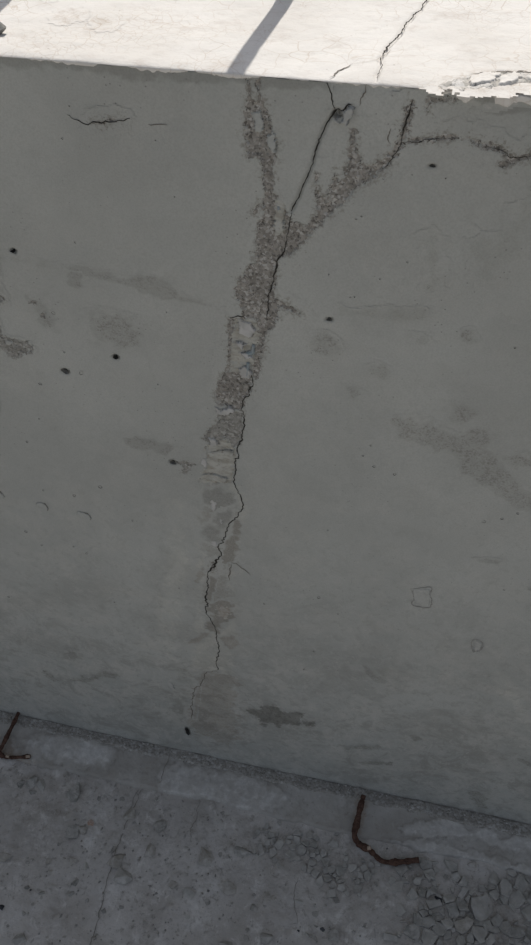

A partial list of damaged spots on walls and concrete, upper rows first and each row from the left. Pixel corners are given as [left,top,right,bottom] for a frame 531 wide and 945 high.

crack [69,104,165,142]
crack [266,0,427,317]
spalling [198,66,531,449]
crack [384,100,531,185]
peeling [161,465,258,749]
crack [190,375,253,718]
leakage [240,703,319,729]
rust [347,790,373,839]